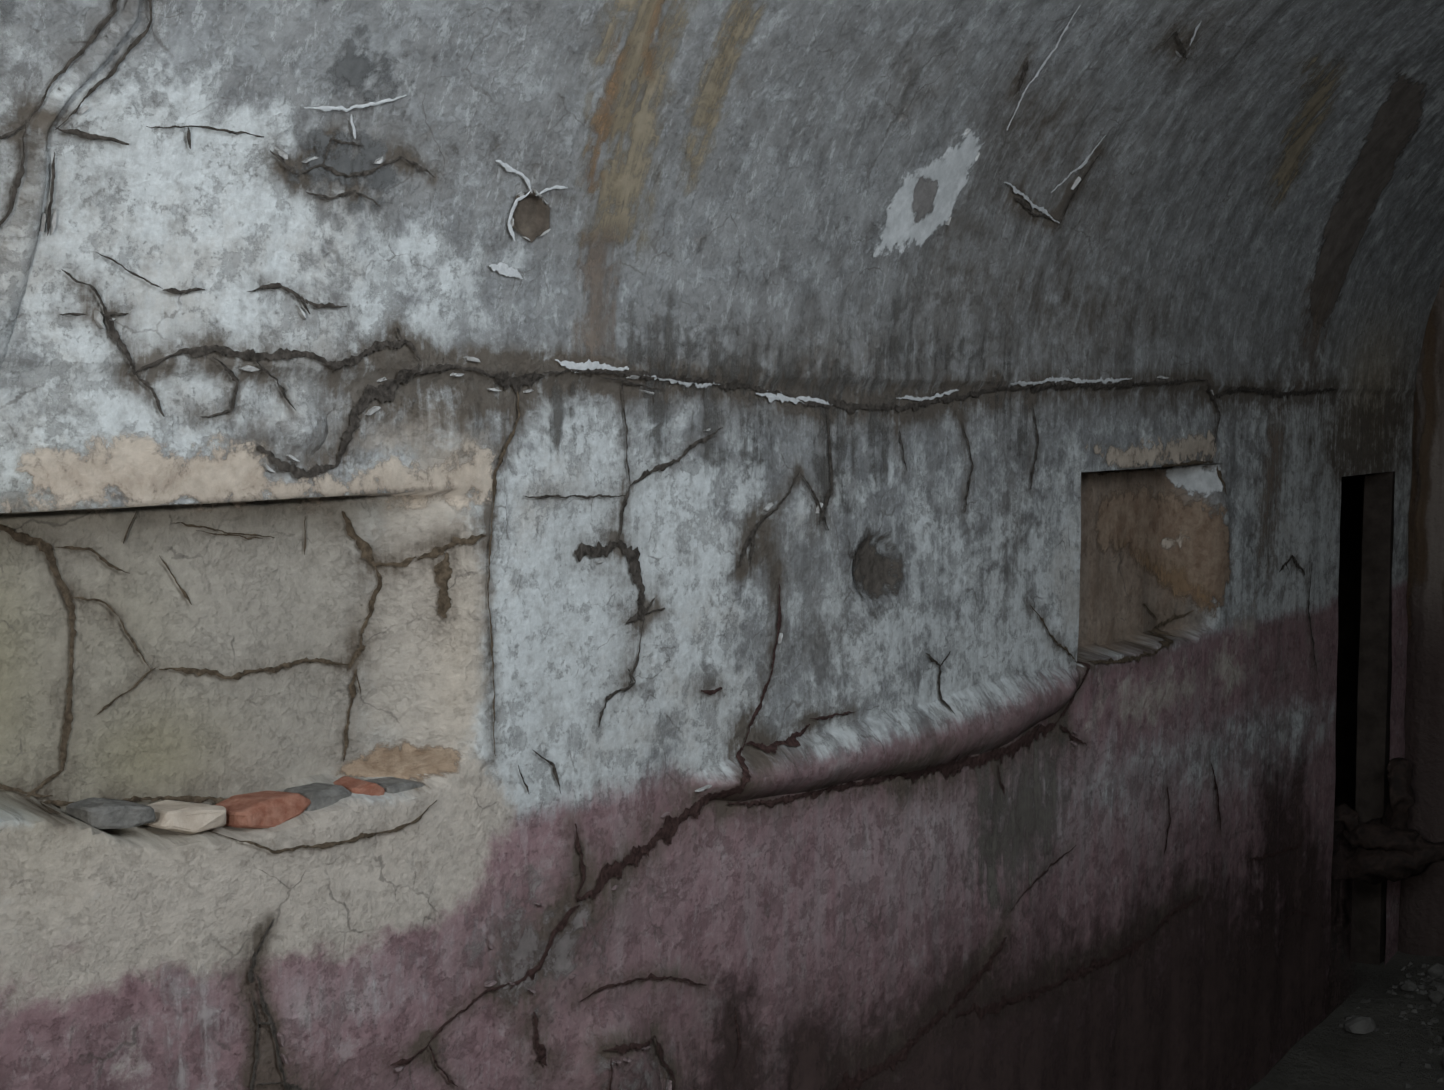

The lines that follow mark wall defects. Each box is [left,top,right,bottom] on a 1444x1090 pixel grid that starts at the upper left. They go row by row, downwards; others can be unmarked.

crack [0,0,435,236]
leakage [285,129,396,210]
leakage [327,25,415,102]
crack [489,160,567,279]
flaking render [510,188,551,243]
peeling [873,128,985,258]
crack [1004,135,1106,226]
flaking render [2,434,496,514]
crack [0,252,1336,1090]
flaking render [341,741,460,781]
leakage [786,739,1354,1090]
leakage [693,979,773,1090]